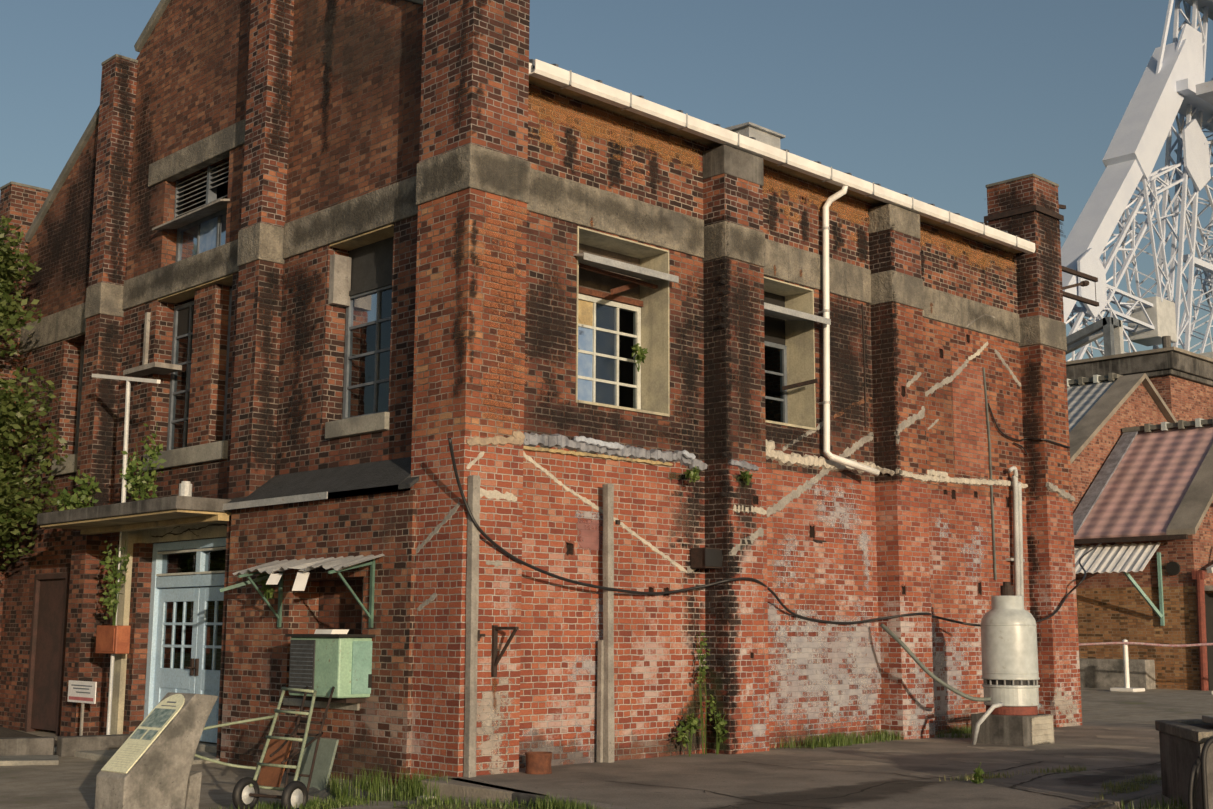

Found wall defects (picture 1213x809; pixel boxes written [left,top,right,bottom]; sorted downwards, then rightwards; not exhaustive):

leakage [320,0,337,153]
leakage [528,84,701,194]
leakage [668,215,882,754]